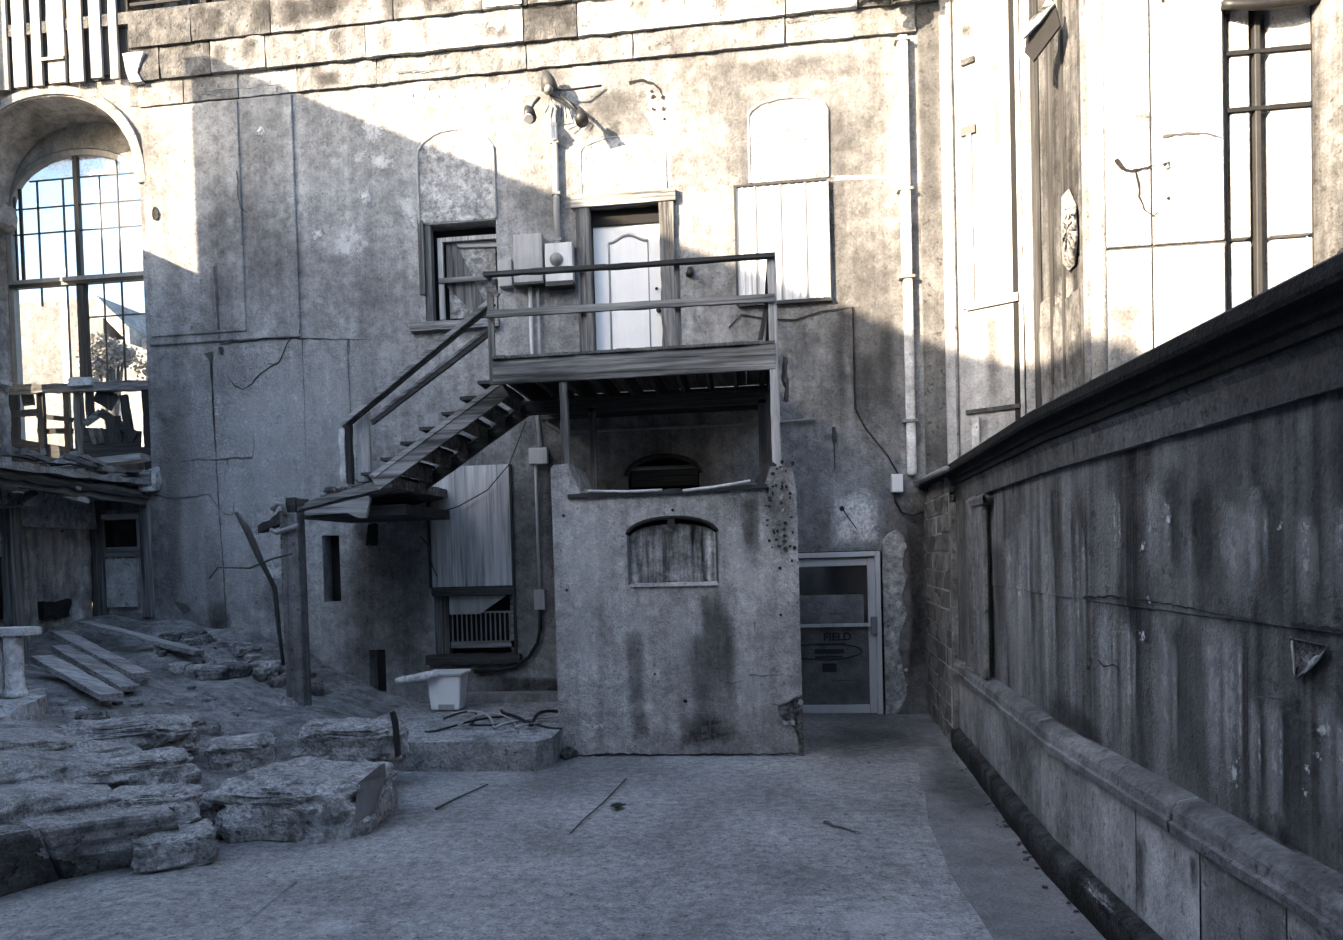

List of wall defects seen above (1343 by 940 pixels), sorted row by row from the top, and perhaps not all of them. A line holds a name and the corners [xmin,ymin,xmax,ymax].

crack [154,266,368,628]
peeling [882,530,908,714]
water stain [1208,646,1241,733]
spalling [1289,637,1330,680]